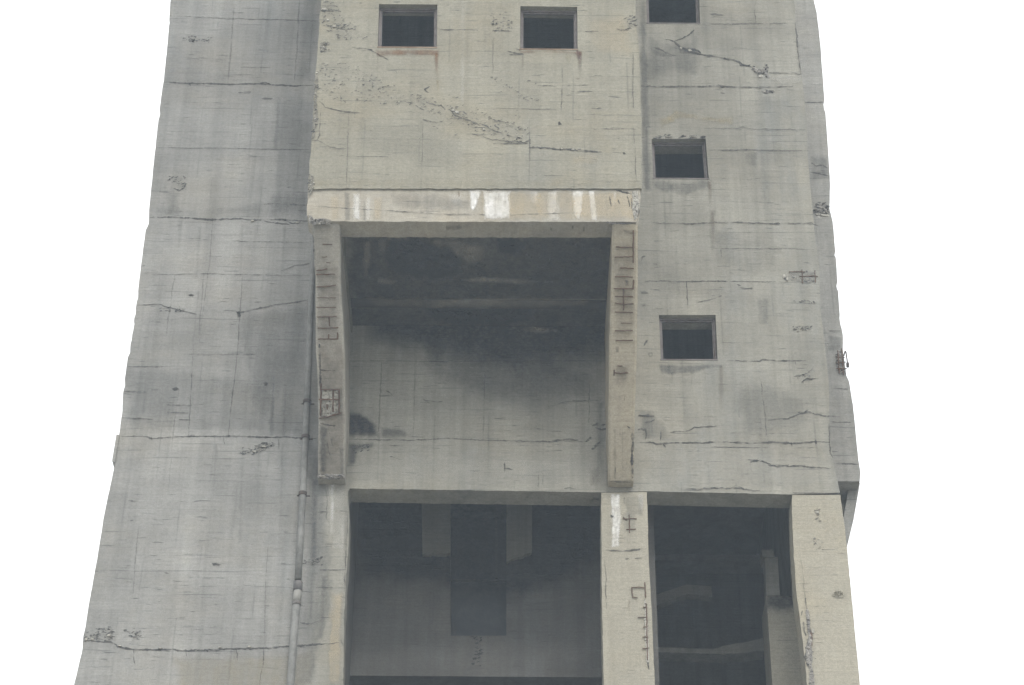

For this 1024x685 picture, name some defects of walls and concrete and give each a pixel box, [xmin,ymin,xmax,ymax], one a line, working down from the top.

crack [170,67,313,99]
crack [622,13,823,129]
crack [416,86,598,152]
spalling [813,202,830,217]
crack [149,204,314,313]
crack [126,397,856,495]
crack [90,623,338,685]